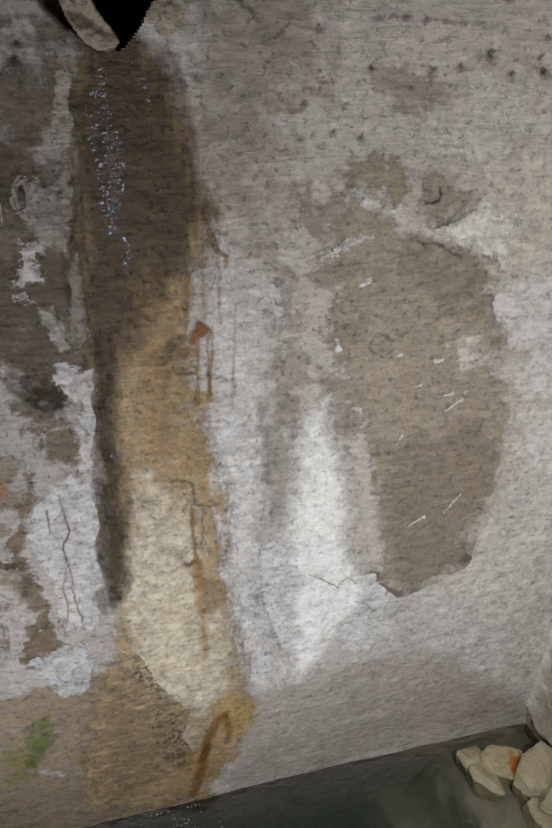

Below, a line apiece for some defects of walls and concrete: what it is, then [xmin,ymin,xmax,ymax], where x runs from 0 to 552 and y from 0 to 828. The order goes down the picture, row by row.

damp [201,0,312,104]
corrosion [208,229,227,283]
corrosion [181,252,213,410]
corrosion [191,693,254,797]
damp [523,674,552,746]